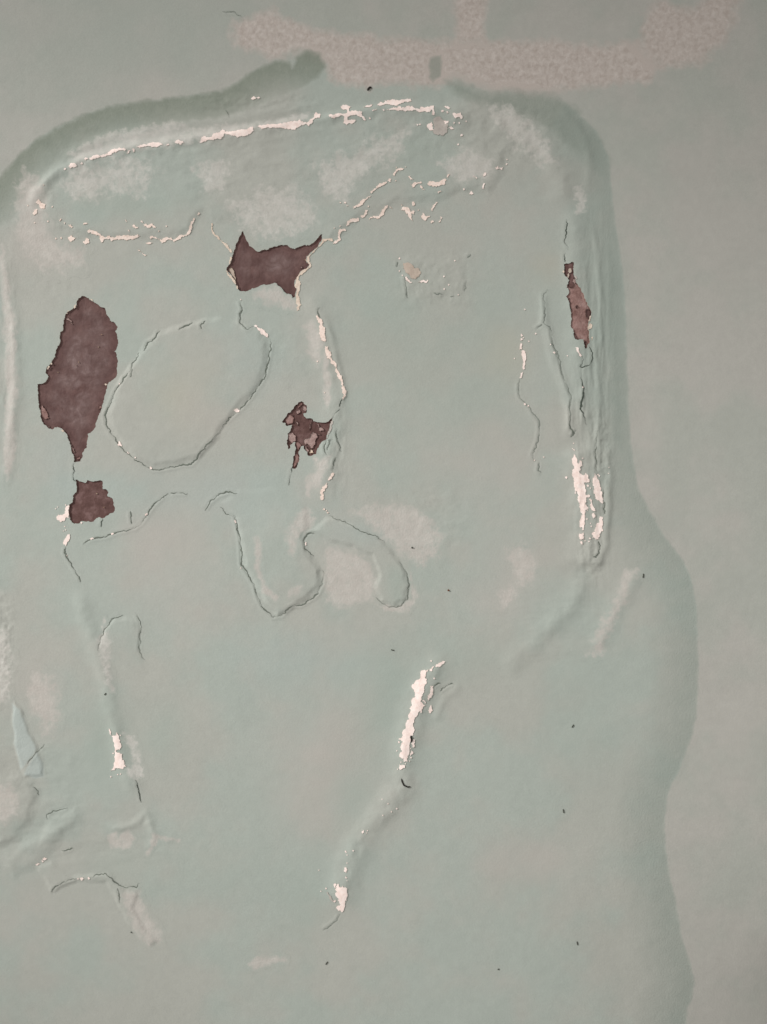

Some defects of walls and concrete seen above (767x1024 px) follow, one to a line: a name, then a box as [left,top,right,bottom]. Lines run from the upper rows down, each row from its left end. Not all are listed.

peeling [211,166,450,311]
damp [0,0,751,486]
peeling [563,262,593,348]
peeling [38,296,118,462]
peeling [55,480,115,530]
peeling [282,401,333,469]
damp [249,447,452,617]
crack [518,382,544,470]
damp [426,51,702,1024]
damp [0,613,67,829]
peeling [396,660,445,770]
damp [114,882,167,952]